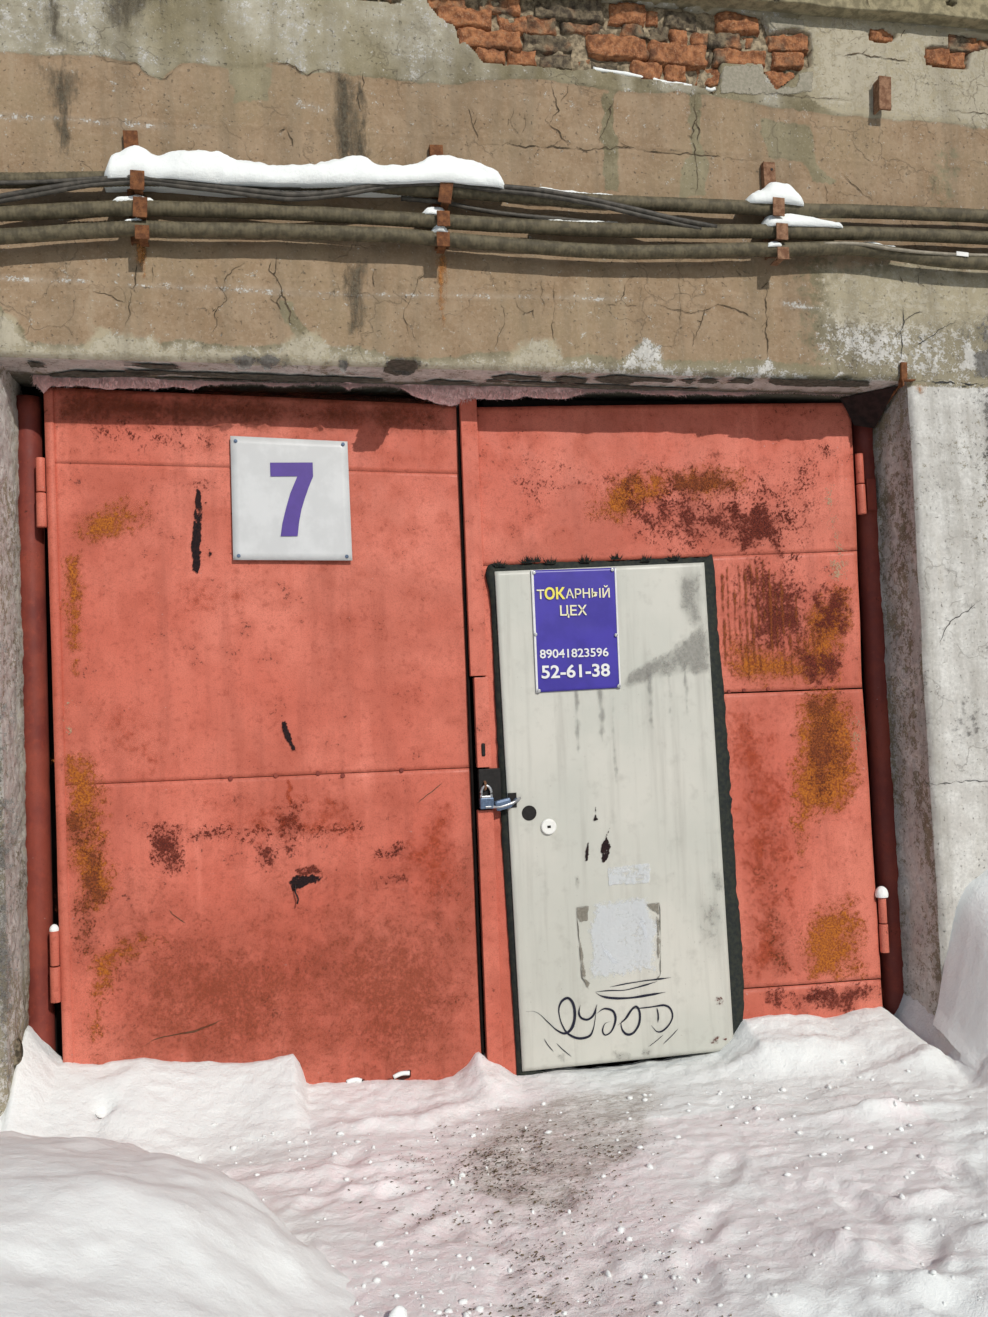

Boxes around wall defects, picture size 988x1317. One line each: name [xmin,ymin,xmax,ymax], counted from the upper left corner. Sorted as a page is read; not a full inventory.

spalling [427,0,809,95]
spalling [868,29,893,43]
spalling [924,34,988,70]
damp [51,74,77,142]
damp [335,73,364,157]
crack [466,88,753,190]
crack [93,265,153,324]
crack [213,261,296,331]
crack [608,278,769,358]
crack [895,276,988,386]
corrosion [60,496,148,675]
corrosion [515,445,883,1013]